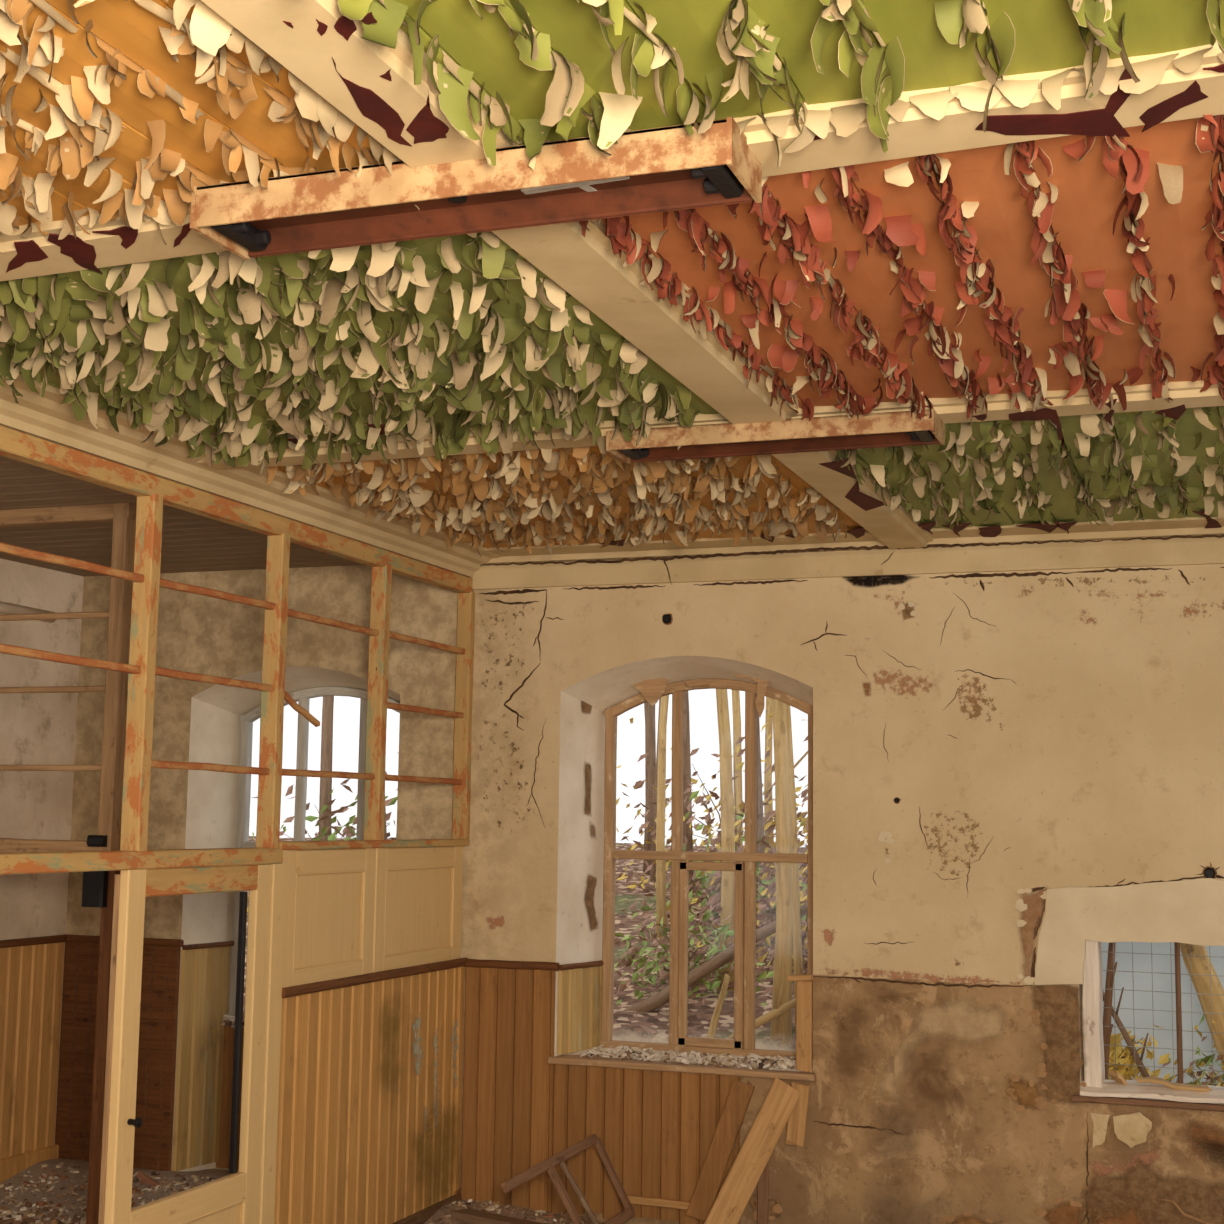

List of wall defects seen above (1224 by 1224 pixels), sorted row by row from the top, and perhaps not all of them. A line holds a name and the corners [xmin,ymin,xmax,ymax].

peeling [0,0,1224,556]
crack [479,535,1224,827]
crack [1096,876,1224,887]
spalling [1006,888,1087,1112]
peeling [1090,1112,1152,1148]
spalling [1034,1163,1224,1224]